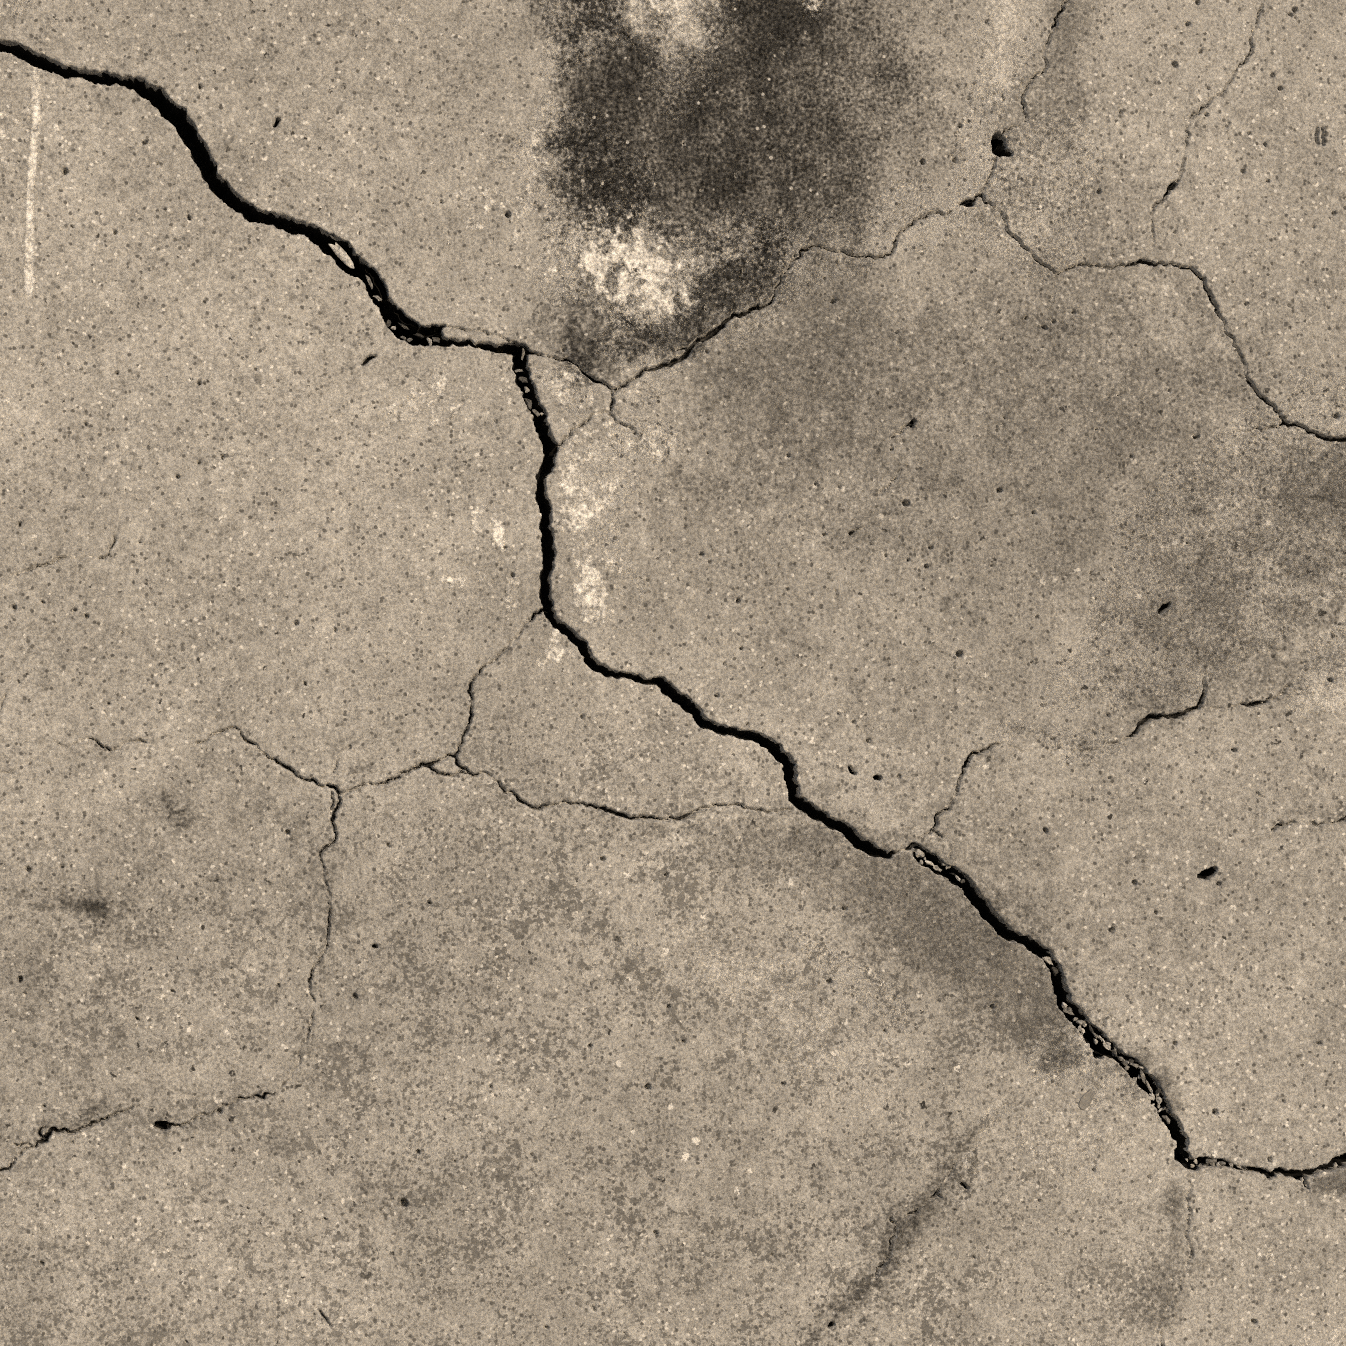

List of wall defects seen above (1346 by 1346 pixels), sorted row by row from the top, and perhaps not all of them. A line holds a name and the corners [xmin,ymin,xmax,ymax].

water stain [986,0,1016,89]
water stain [466,188,523,240]
water stain [520,0,952,457]
crack [555,129,1012,410]
efflorescence [379,376,460,424]
crack [1246,380,1346,442]
crack [0,43,895,871]
efflorescence [471,507,505,552]
efflorescence [440,571,489,599]
crack [1109,680,1204,744]
crack [900,843,1346,1187]
crack [0,1108,131,1171]